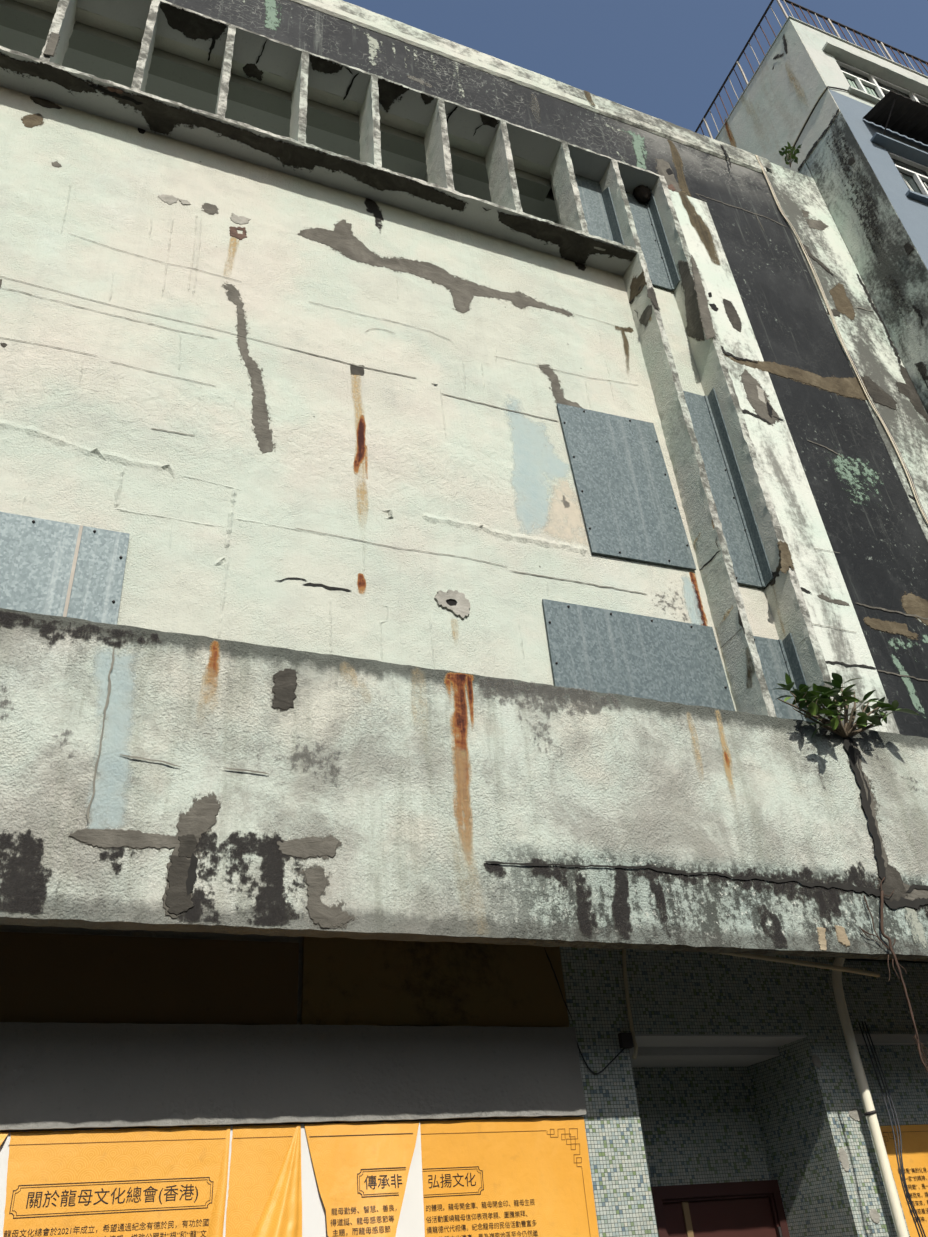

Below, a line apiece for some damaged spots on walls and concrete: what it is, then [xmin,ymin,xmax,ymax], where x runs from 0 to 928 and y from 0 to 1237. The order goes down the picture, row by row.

spalling [310,55,359,100]
spalling [378,79,434,112]
peeling [739,369,781,426]
corrosion [353,375,368,513]
corrosion [357,573,366,593]
spalling [434,589,470,620]
corrosion [445,672,474,849]
crack [484,737,928,909]
leakage [0,828,60,914]
mould [179,831,307,926]
leakage [531,858,598,938]
leakage [611,862,879,948]